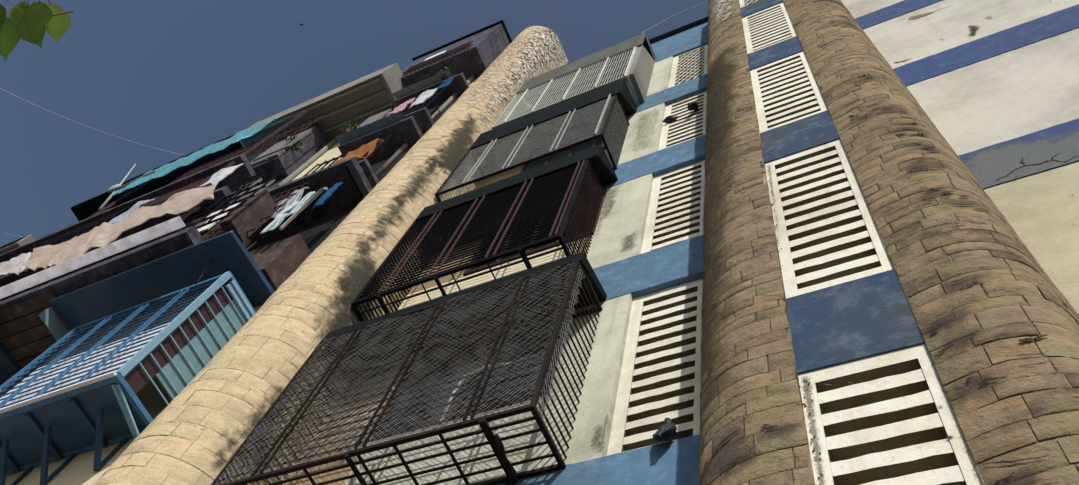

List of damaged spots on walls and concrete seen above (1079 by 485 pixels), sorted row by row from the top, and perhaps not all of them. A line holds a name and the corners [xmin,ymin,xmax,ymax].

water stain [321,116,475,338]